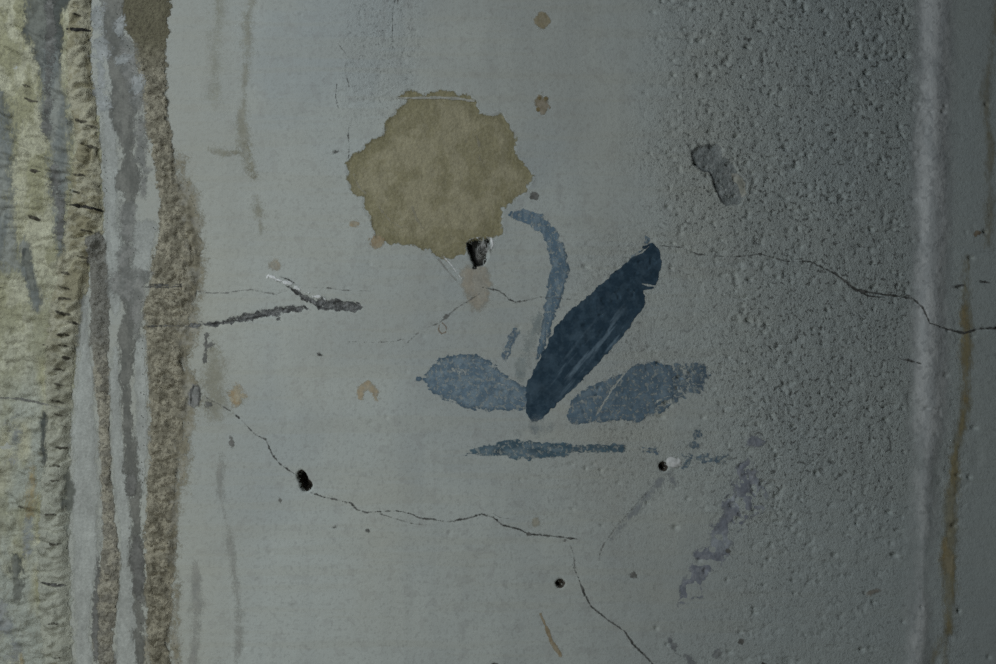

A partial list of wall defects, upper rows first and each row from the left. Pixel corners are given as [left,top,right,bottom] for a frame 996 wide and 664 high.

leakage [0,91,43,312]
leakage [22,0,73,255]
spalling [344,89,539,261]
leakage [61,0,158,664]
crack [147,275,362,328]
crack [730,253,996,334]
leakage [40,412,48,464]
crack [206,397,294,474]
corrosion [940,285,972,634]
leakage [0,518,33,664]
crack [314,493,653,664]